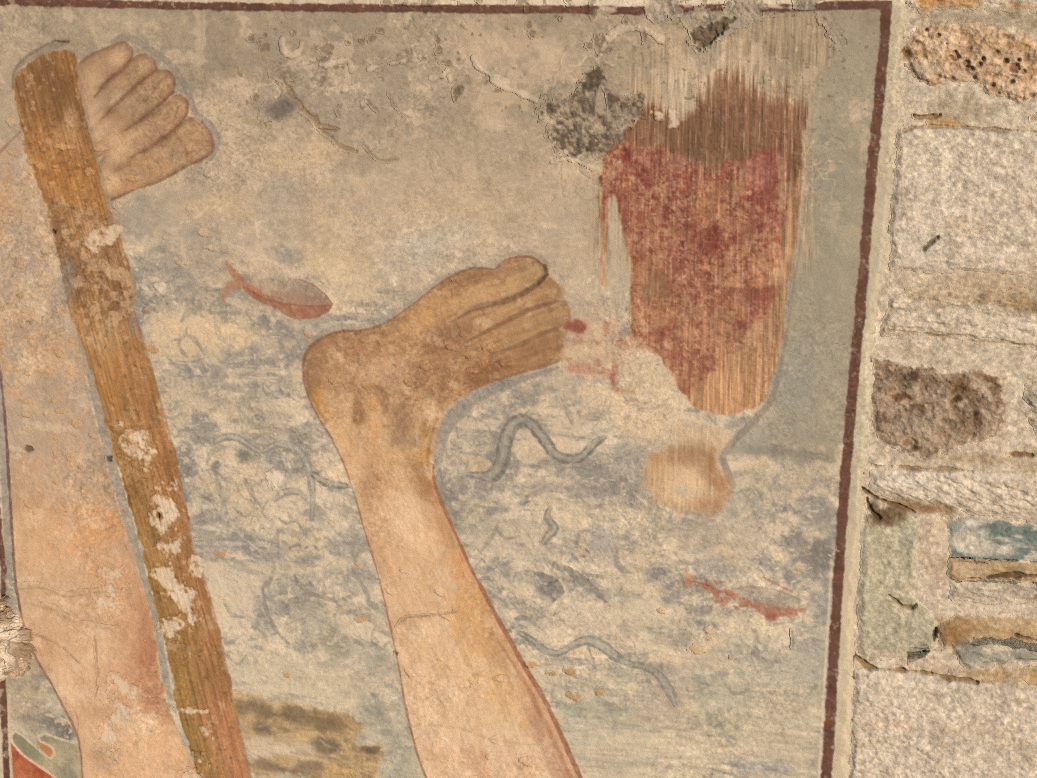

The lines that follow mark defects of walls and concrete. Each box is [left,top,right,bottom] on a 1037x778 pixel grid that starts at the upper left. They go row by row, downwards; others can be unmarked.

peeling [379,0,438,21]
spalling [246,27,465,103]
spalling [471,0,777,171]
peeling [82,223,125,260]
peeling [105,417,228,645]